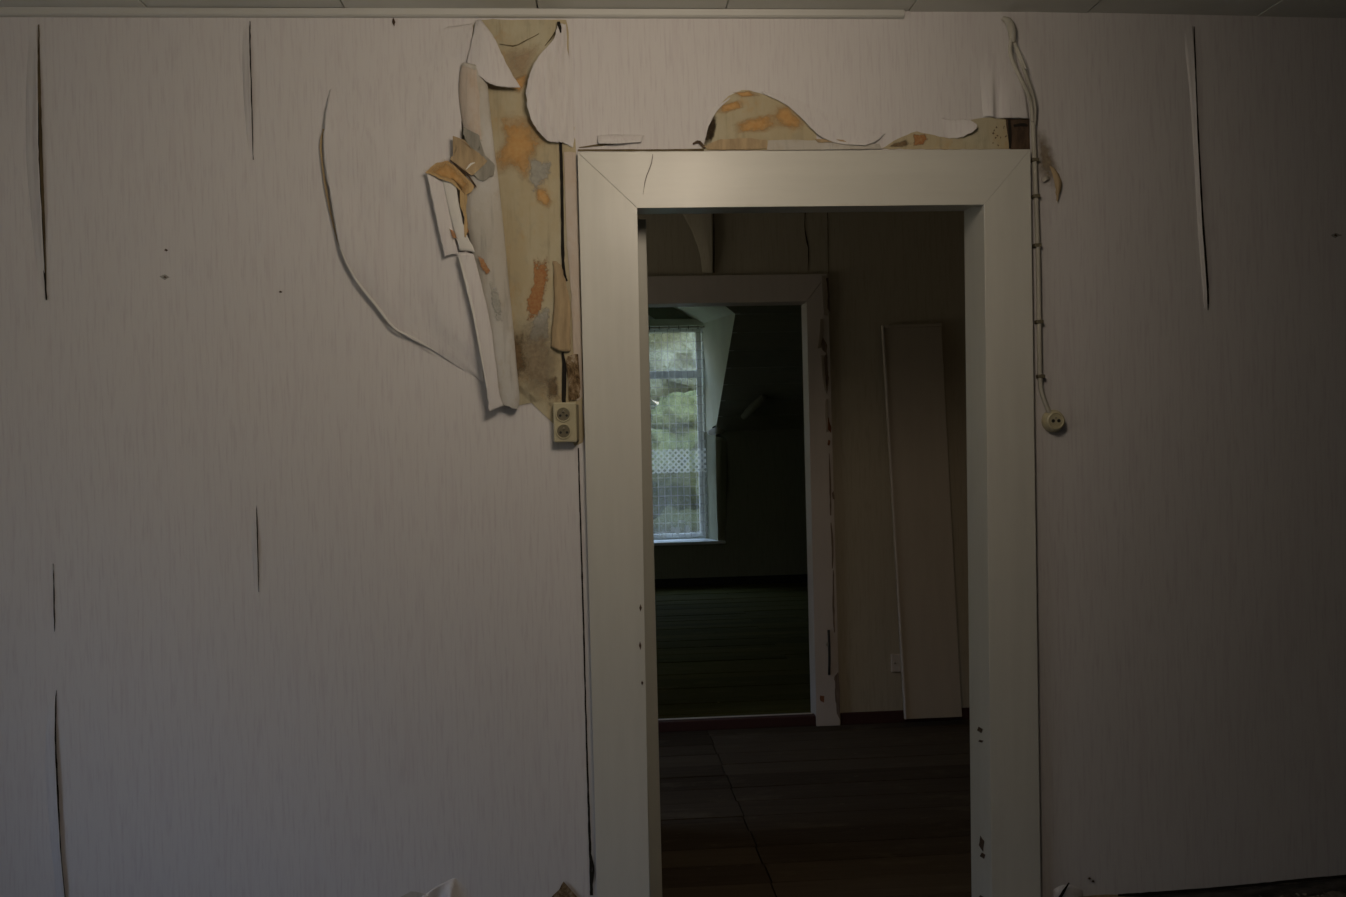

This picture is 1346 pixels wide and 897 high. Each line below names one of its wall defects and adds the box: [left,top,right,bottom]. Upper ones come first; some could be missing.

crack [26,24,47,300]
crack [242,23,254,160]
flaking render [473,19,584,446]
flaking render [701,90,817,151]
flaking render [882,117,1027,150]
crack [1185,26,1209,310]
crack [50,570,58,632]
crack [251,506,259,588]
crack [45,691,66,897]
spalling [552,882,577,897]